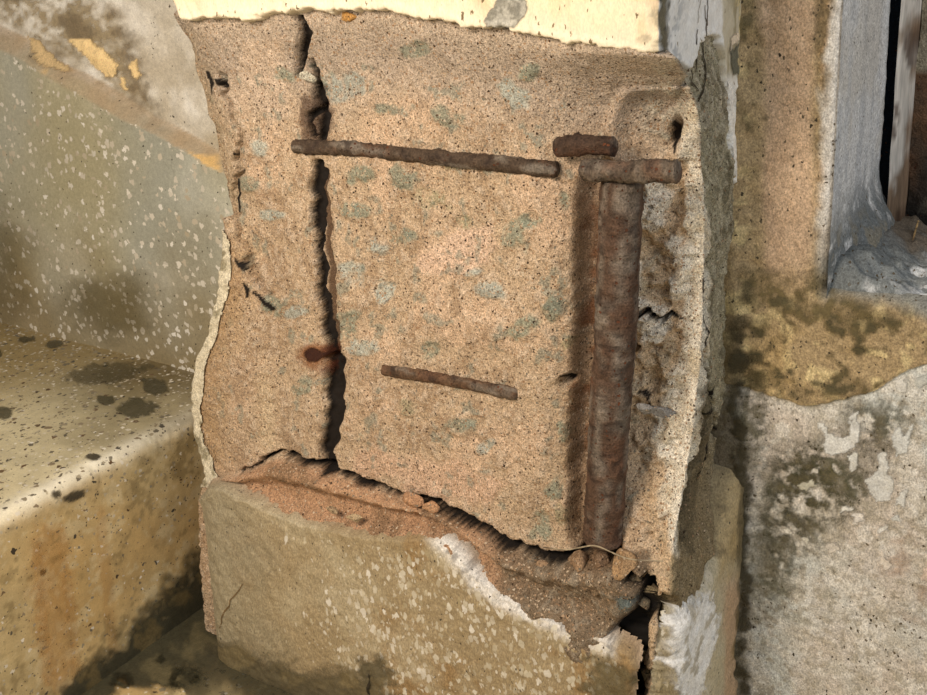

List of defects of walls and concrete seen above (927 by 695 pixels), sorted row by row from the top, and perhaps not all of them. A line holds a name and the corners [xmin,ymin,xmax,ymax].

peeling [30,38,69,71]
leakage [0,0,147,103]
peeling [69,39,142,90]
crack [672,120,682,153]
crack [235,259,275,310]
crack [245,15,591,563]
rust [304,343,345,373]
spalling [174,0,740,695]
leakage [727,322,792,695]
leakage [763,445,865,554]
leakage [63,552,393,695]
crack [619,571,666,694]